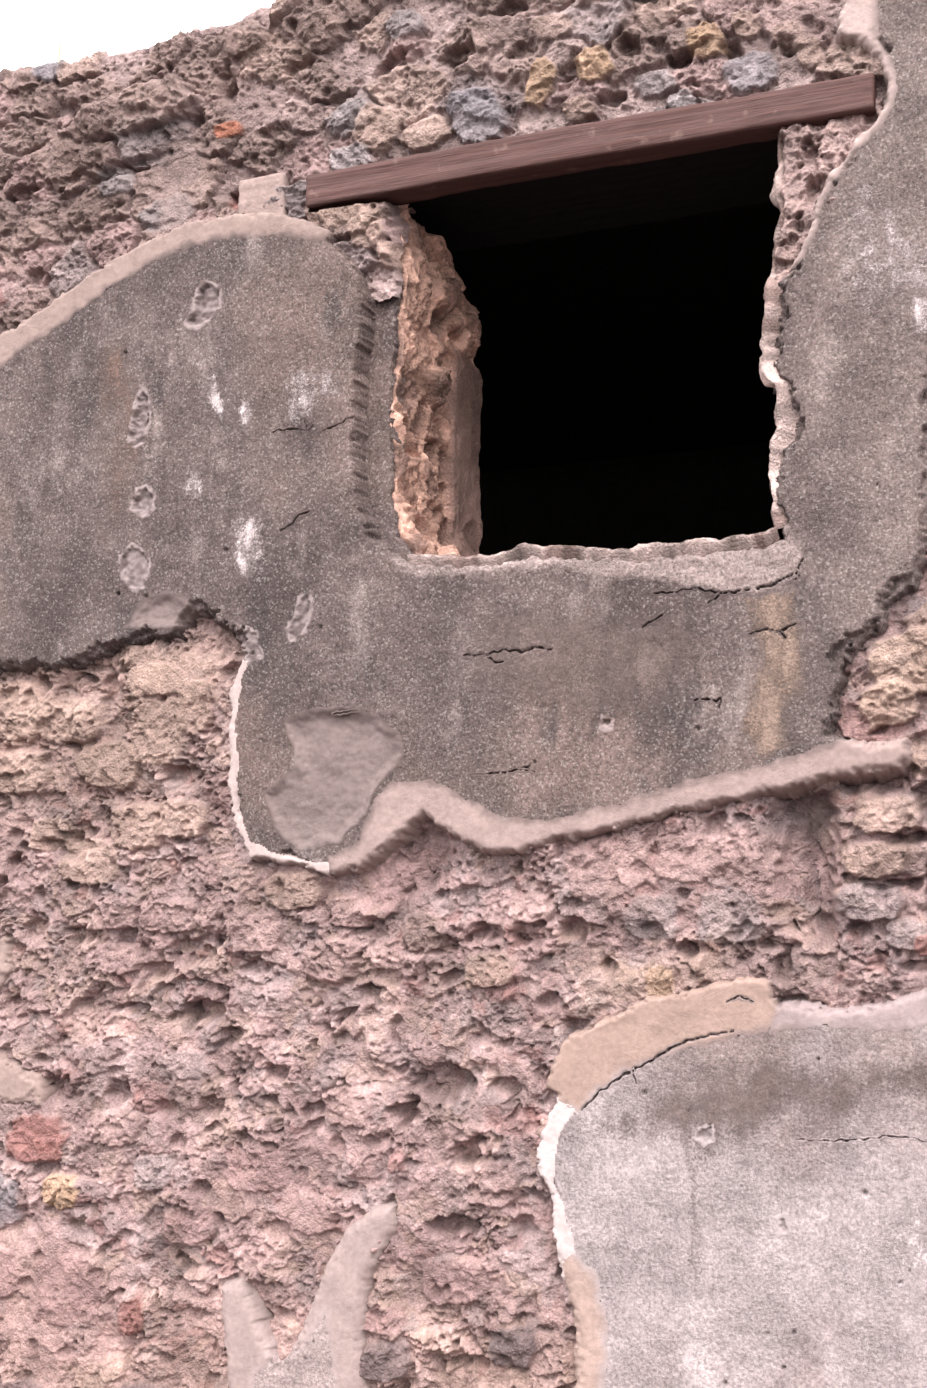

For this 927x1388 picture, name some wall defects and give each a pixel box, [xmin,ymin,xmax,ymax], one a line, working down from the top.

spalling [774,98,883,294]
flaking render [183,277,224,332]
flaking render [125,386,153,450]
flaking render [128,483,157,520]
crack [640,555,805,629]
crack [461,646,553,665]
crack [746,622,797,639]
spalling [0,542,927,1388]
crack [580,994,754,1113]